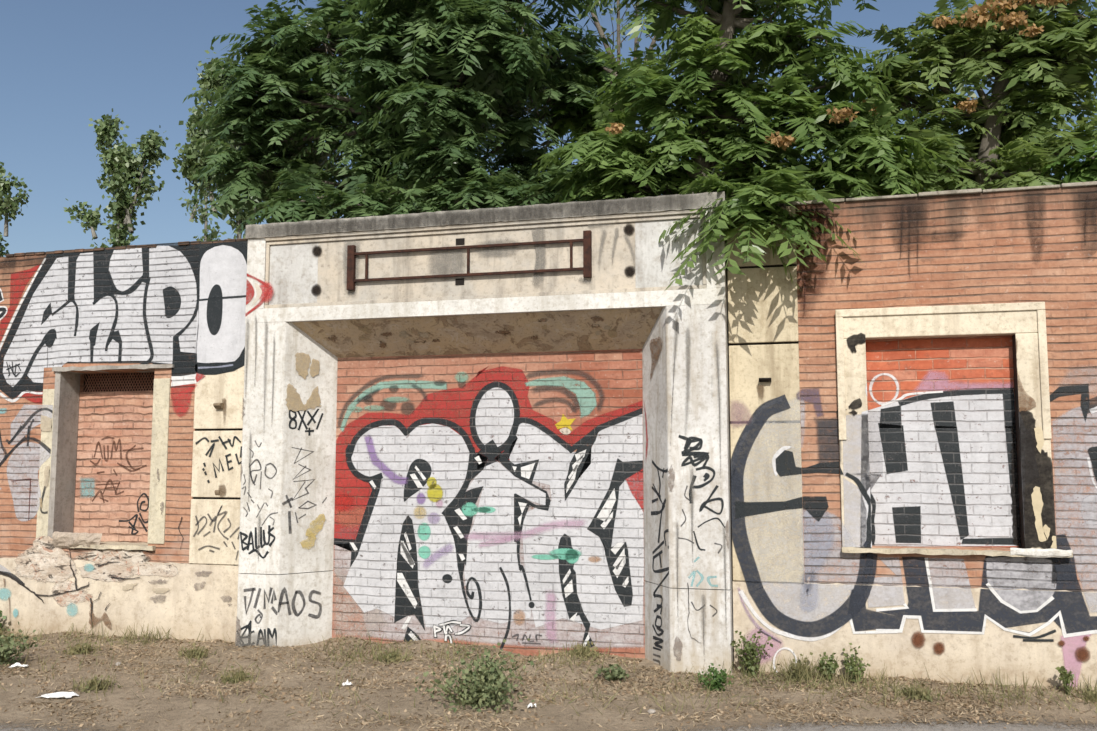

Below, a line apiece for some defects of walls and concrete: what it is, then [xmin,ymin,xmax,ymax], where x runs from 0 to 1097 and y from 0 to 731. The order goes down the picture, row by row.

spalling [14,536,178,630]